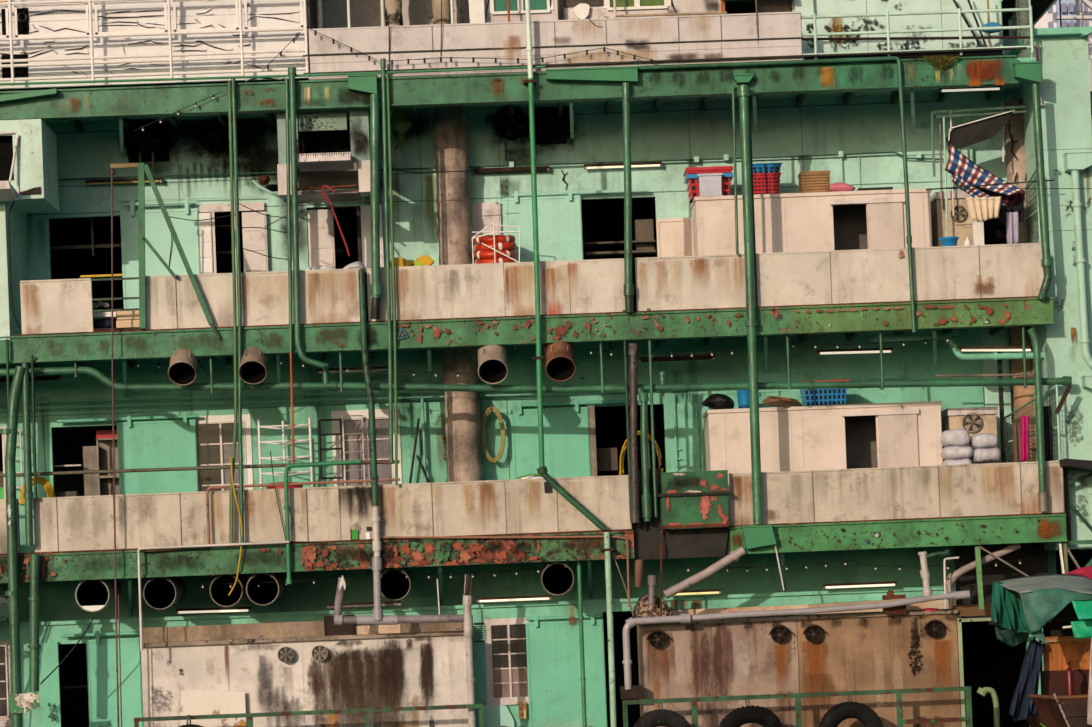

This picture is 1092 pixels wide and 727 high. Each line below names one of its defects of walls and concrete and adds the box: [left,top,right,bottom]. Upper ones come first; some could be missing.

water stain [806,17,884,50]
water stain [876,40,925,51]
rust [966,60,1004,86]
rust [505,266,517,293]
rust [13,284,1047,347]
peeling [666,473,729,526]
rust [0,548,138,556]
rust [218,539,412,547]
rust [729,502,1066,546]
water stain [258,662,300,727]
water stain [307,636,433,727]
rust [691,629,733,709]